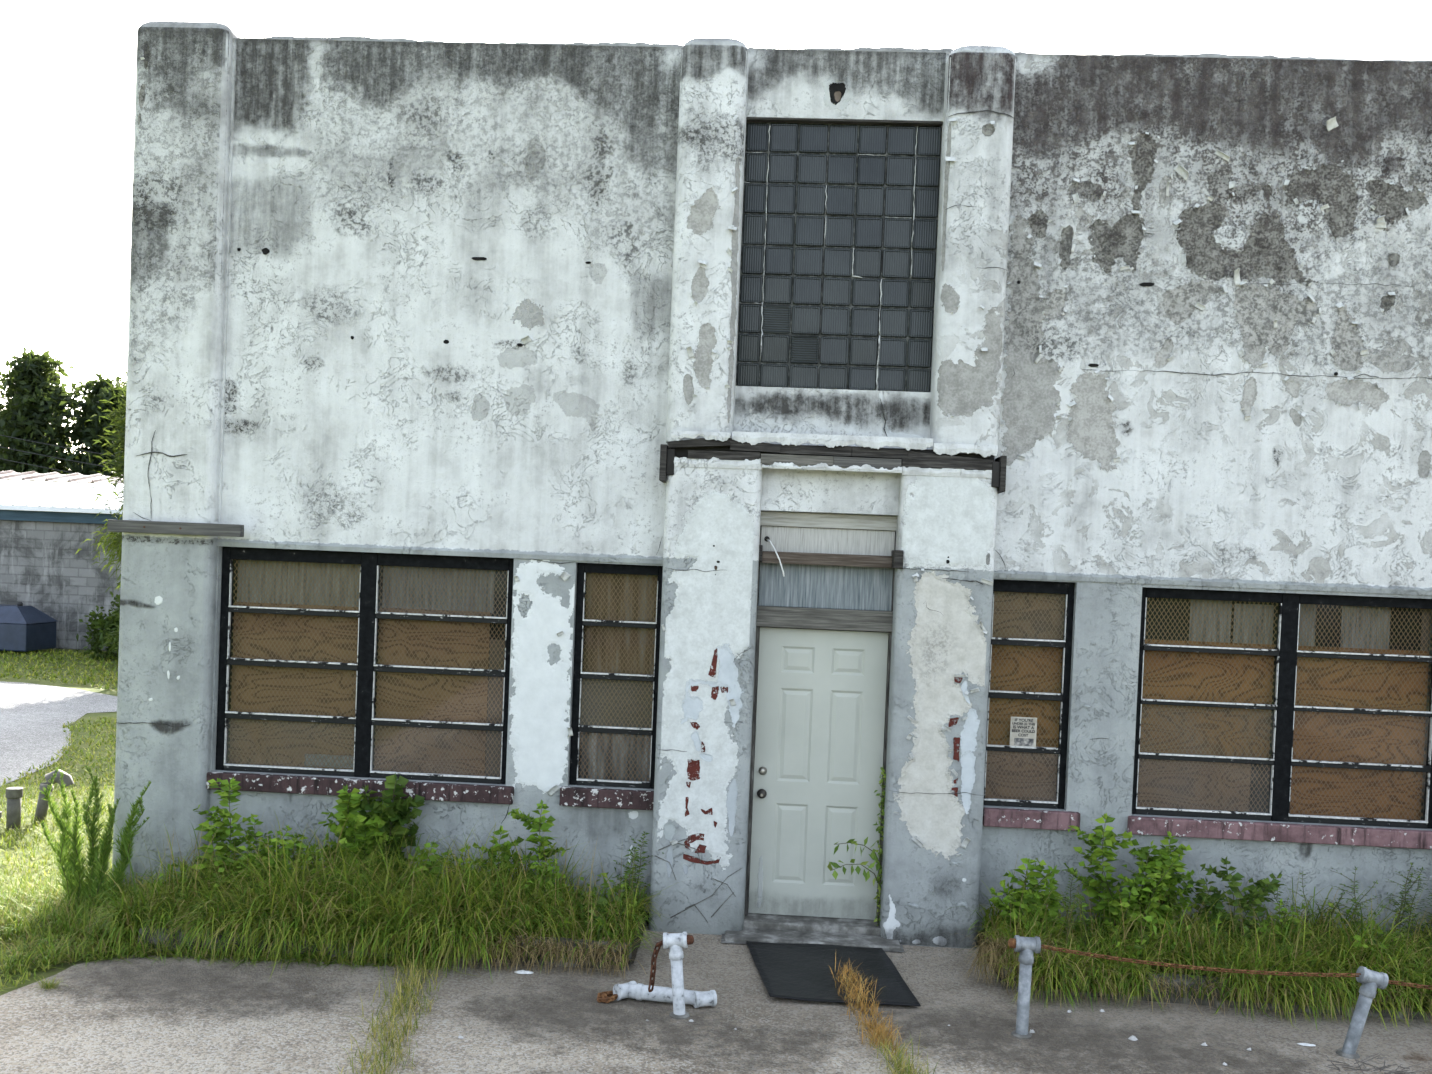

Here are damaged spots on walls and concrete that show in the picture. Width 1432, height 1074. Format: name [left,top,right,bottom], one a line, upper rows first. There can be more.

water stain [132,183,173,228]
water stain [137,27,310,129]
water stain [327,40,1432,286]
water stain [736,393,931,438]
peeling [671,116,1429,861]
peeling [1418,450,1432,478]
peeling [509,559,575,796]
peeling [657,489,757,878]